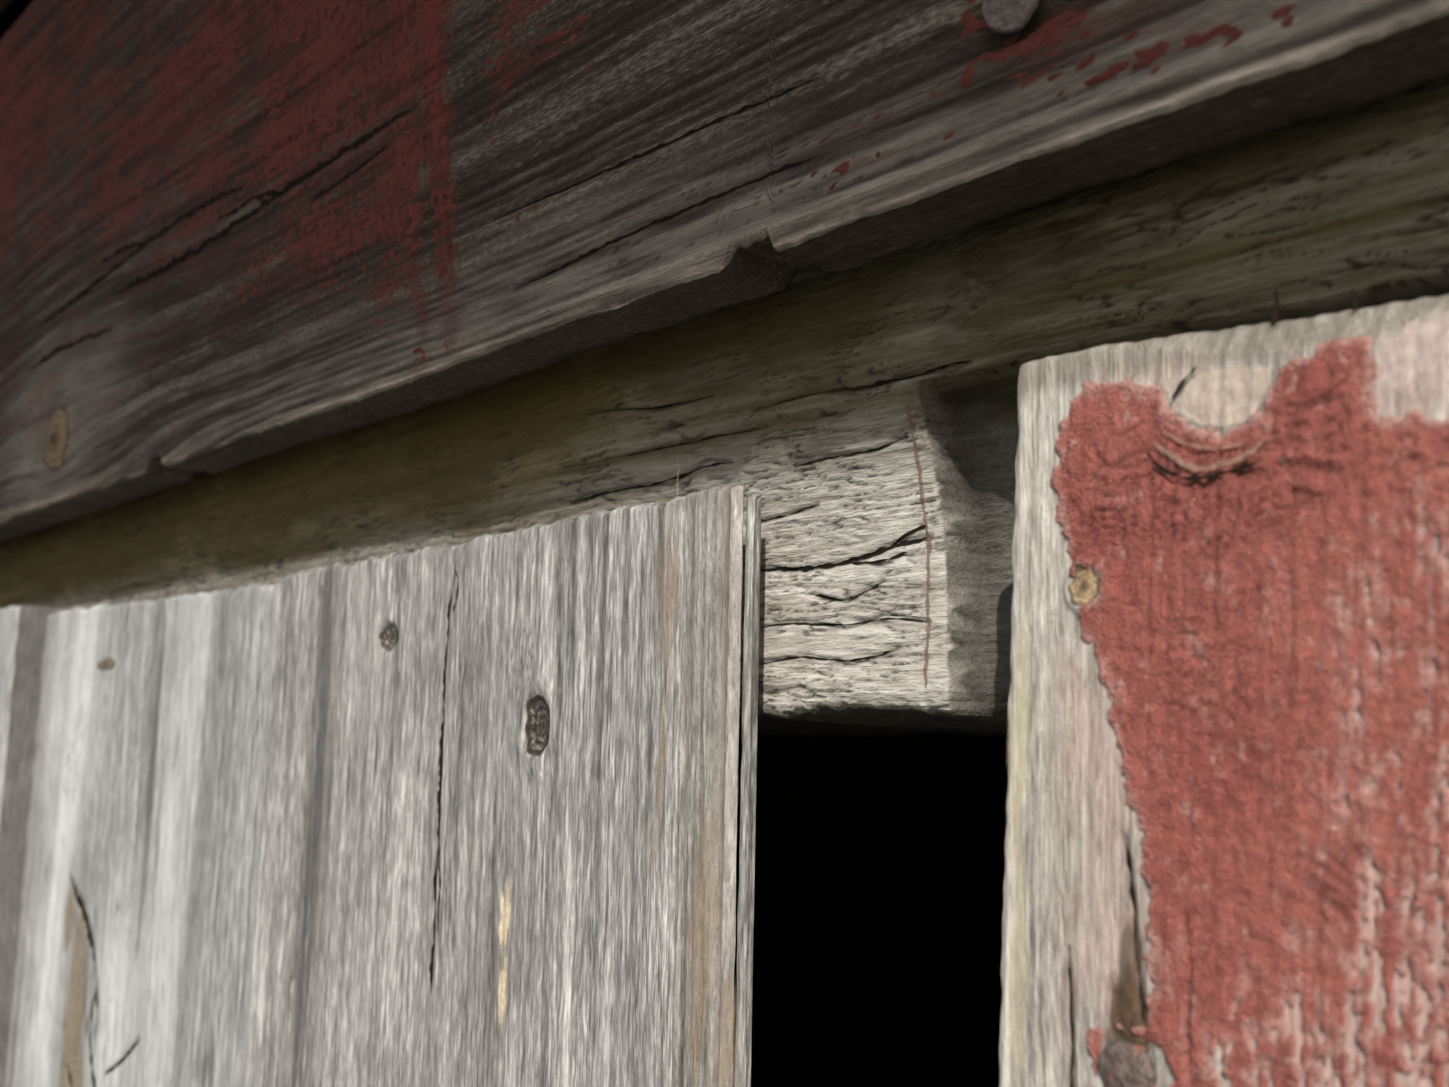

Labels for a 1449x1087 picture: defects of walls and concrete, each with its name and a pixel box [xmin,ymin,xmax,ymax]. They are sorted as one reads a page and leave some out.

crack [31,103,418,370]
crack [429,569,458,991]
crack [759,525,927,665]
peeling [1050,335,1449,1087]
crack [67,878,139,1087]